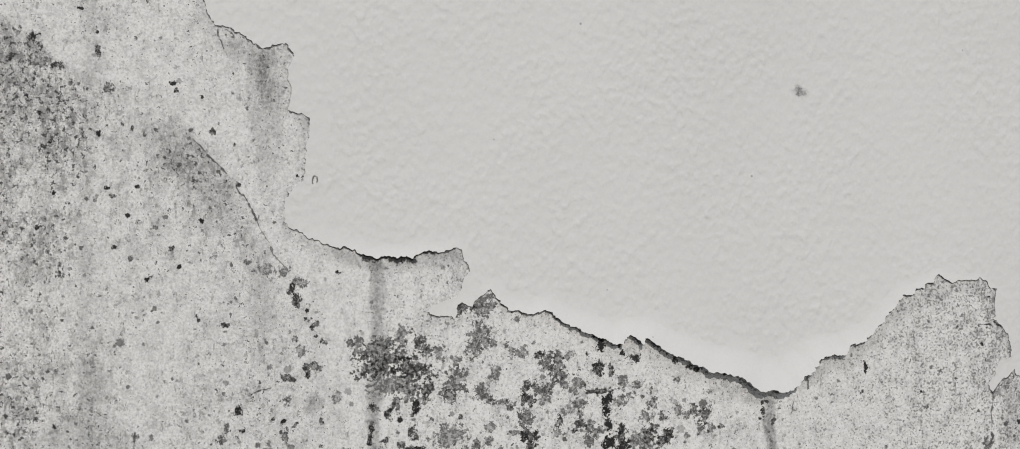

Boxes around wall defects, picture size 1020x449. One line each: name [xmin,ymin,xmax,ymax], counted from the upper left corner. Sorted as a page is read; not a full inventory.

water stain [18,25,64,69]
water stain [346,293,725,449]